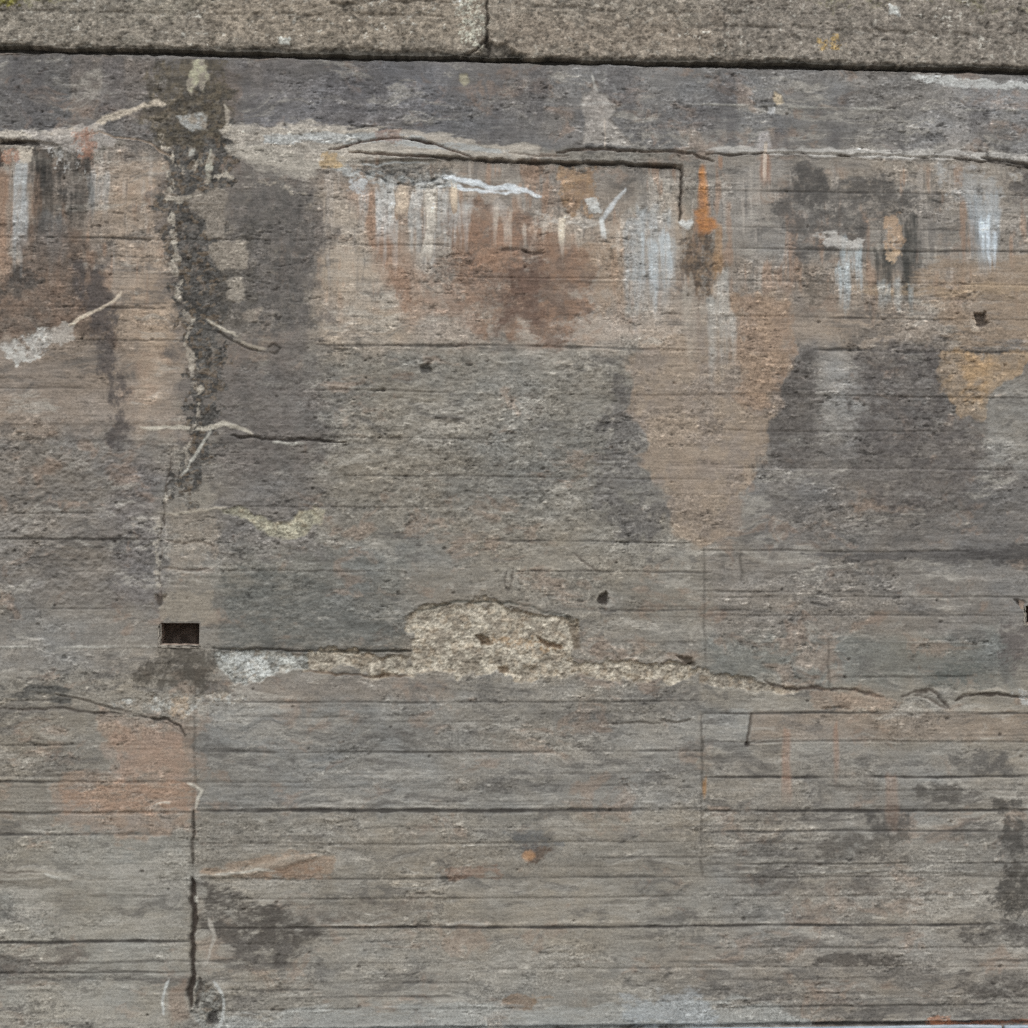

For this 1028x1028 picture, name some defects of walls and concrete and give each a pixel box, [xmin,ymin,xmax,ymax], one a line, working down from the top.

leakage [0,147,137,462]
crack [0,97,172,174]
leakage [104,57,740,508]
crack [328,136,1028,231]
rust [690,156,725,293]
leakage [762,155,924,326]
rust [620,281,802,551]
leakage [762,333,988,521]
crack [138,419,348,628]
spalling [111,594,799,720]
spalling [595,589,626,609]
crack [154,782,205,1012]